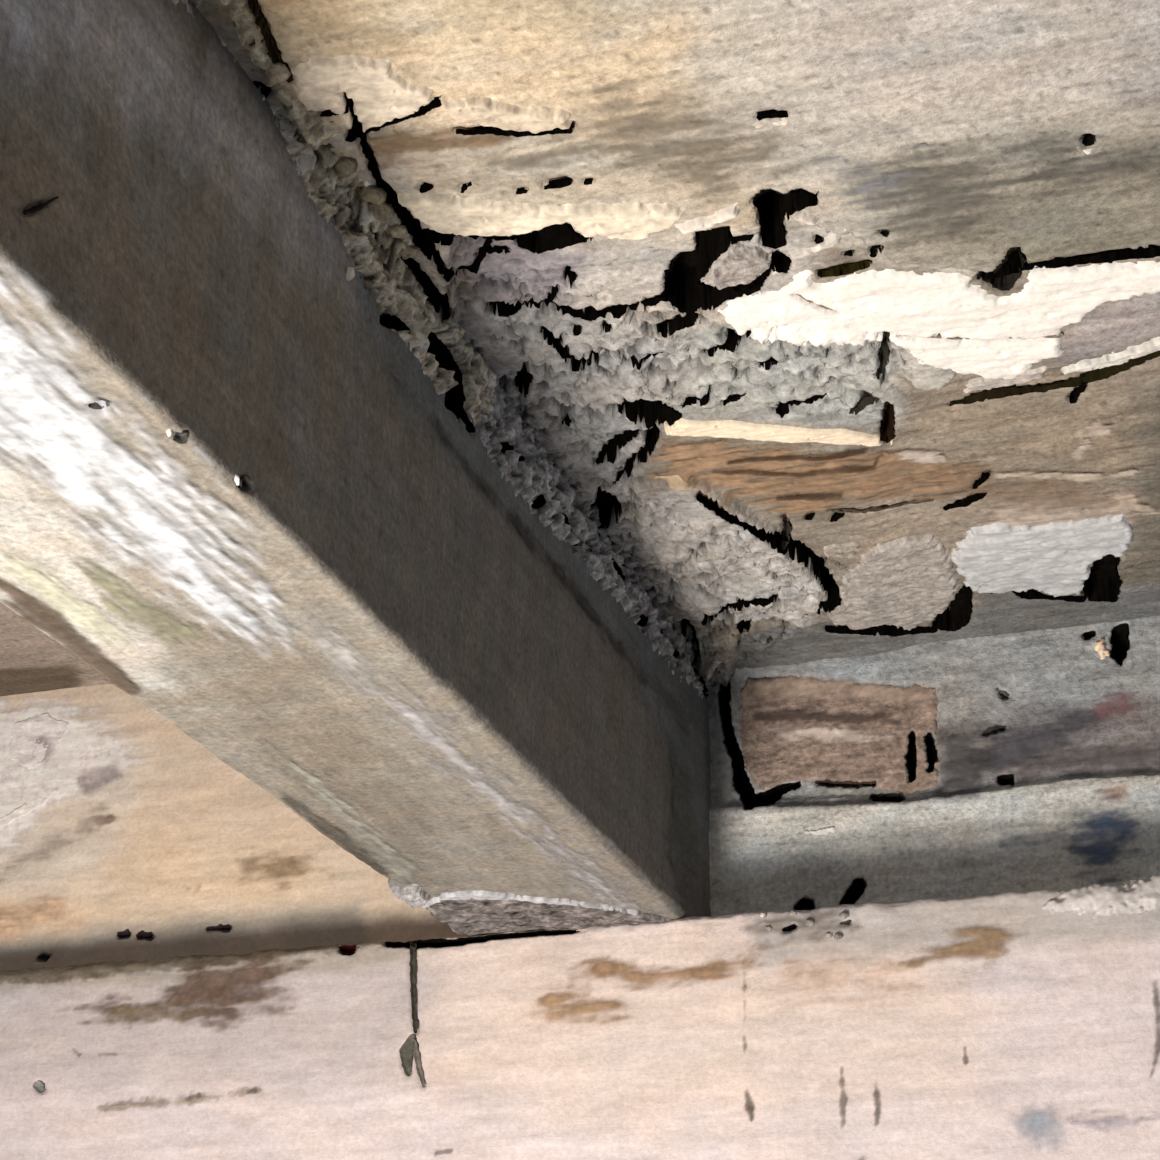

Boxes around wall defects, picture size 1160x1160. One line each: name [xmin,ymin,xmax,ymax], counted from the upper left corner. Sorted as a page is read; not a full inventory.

flaking render [291,55,574,169]
hole [752,109,789,128]
peeling [397,188,1160,393]
peeling [234,474,251,491]
spalling [469,362,721,700]
spalling [881,401,895,443]
peeling [823,492,1144,631]
spalling [739,675,1005,803]
spalling [997,775,1013,786]
crack [385,930,576,1088]